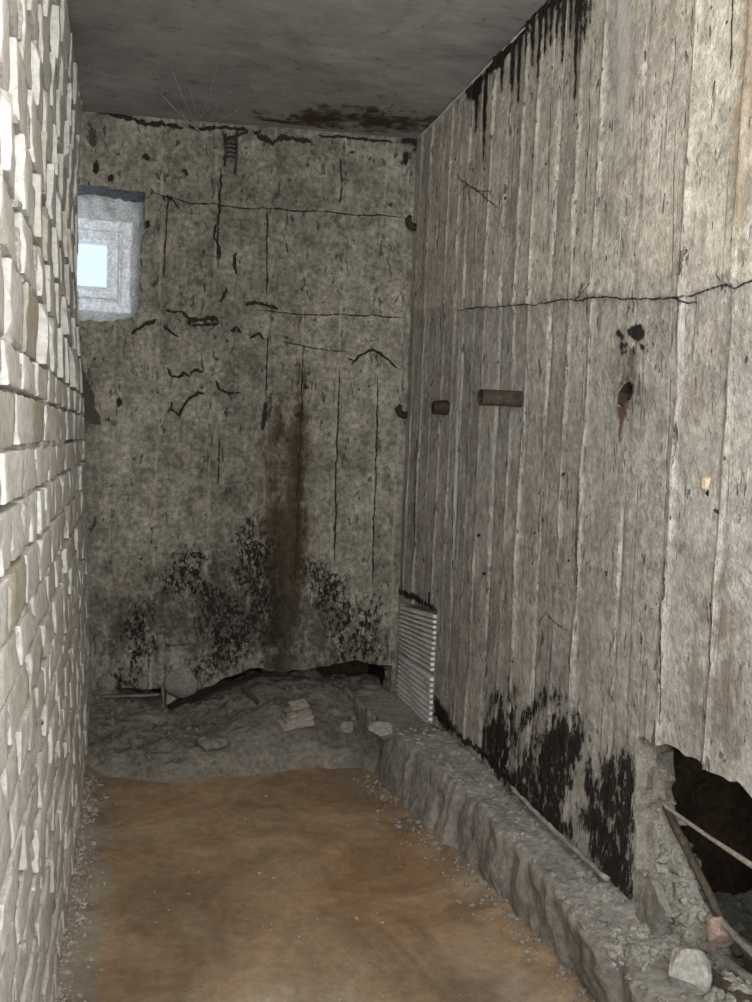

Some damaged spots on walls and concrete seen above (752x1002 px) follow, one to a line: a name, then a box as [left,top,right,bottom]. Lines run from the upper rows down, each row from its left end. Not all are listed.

water stain [465,0,592,156]
crack [545,105,553,203]
crack [451,121,752,311]
water stain [612,0,633,171]
crack [727,0,735,68]
crack [97,112,422,580]
spalling [617,381,633,406]
water stain [102,604,160,689]
water stain [162,514,285,685]
water stain [301,559,385,664]
spalling [482,684,752,1002]